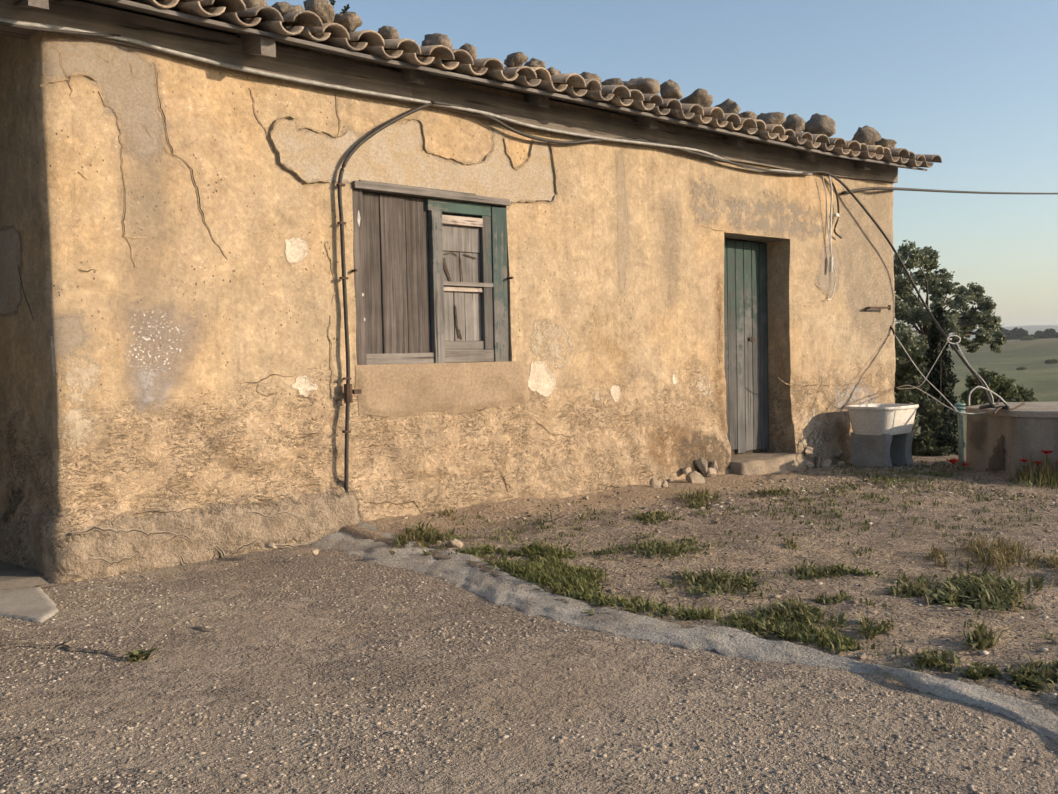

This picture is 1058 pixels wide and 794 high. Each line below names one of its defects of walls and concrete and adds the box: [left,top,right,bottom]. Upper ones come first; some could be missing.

crack [56,48,228,267]
flaking render [268,116,558,208]
peeling [285,237,308,264]
leakage [125,311,197,404]
crack [241,373,296,397]
peeling [292,375,318,397]
peeling [528,360,556,397]
crack [255,483,325,501]
crack [124,506,210,516]